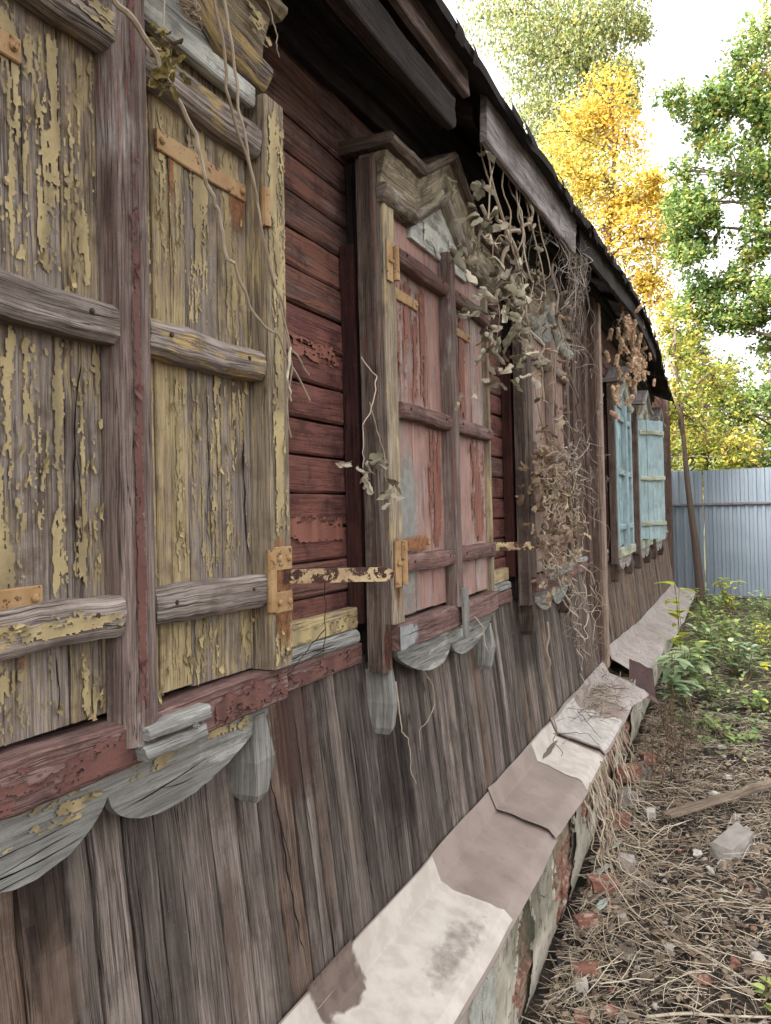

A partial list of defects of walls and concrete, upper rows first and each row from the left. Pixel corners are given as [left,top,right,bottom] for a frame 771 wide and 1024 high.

peeling [71,0,115,37]
peeling [0,0,94,292]
corrosion [229,195,244,230]
peeling [267,108,343,543]
peeling [0,325,104,597]
peeling [130,141,249,713]
corrosion [277,611,291,641]
corrosion [277,570,292,592]
corrosion [394,535,428,573]
peeling [0,609,362,836]
damp [281,857,513,1024]
spalling [508,901,535,1018]